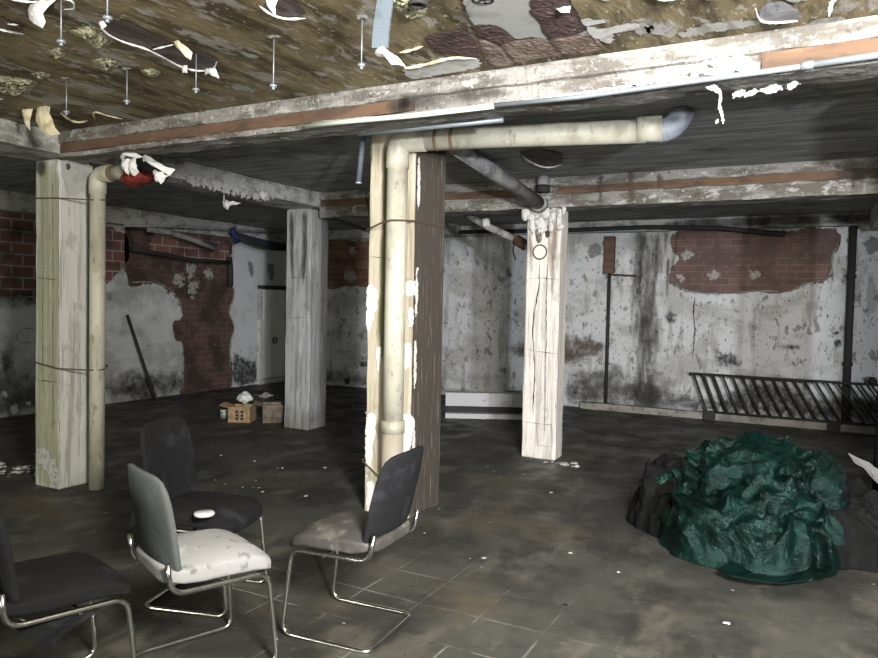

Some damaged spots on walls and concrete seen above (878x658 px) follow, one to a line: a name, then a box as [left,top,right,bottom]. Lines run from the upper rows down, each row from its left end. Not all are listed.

peeling [12,0,75,28]
peeling [463,0,548,39]
damp [705,85,725,124]
flaking render [0,211,37,300]
flaking render [106,227,285,394]
flaking render [327,240,379,331]
damp [569,234,693,407]
flaking render [669,228,841,294]
damp [0,354,36,411]
damp [105,376,177,398]
damp [705,385,877,424]
peeling [365,412,376,511]